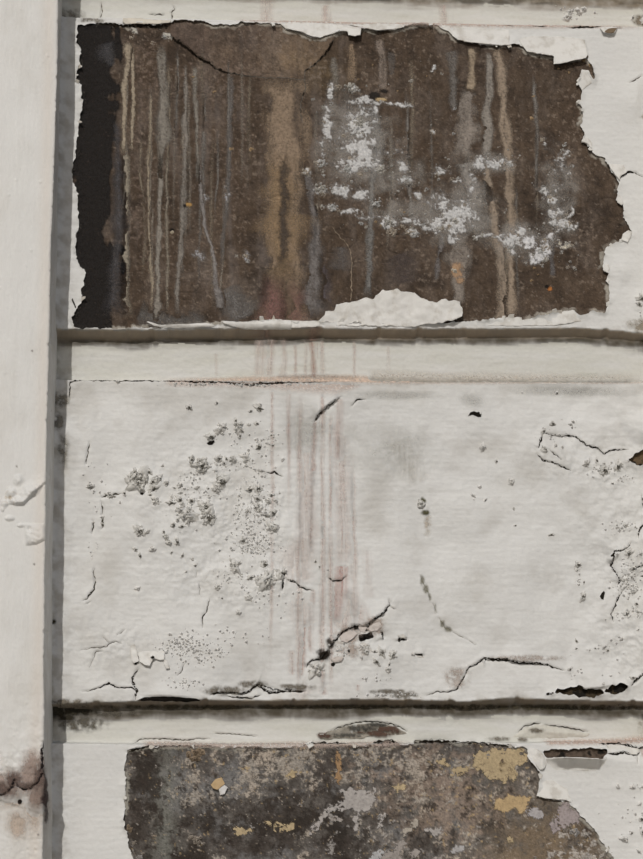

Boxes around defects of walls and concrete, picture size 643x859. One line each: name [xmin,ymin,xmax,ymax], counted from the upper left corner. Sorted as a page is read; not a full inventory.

crack [98,4,333,122]
leakage [68,11,252,329]
peeling [101,18,632,330]
leakage [263,41,579,321]
crack [538,433,626,471]
crack [610,498,643,622]
crack [89,671,138,700]
crack [212,684,304,699]
crack [306,603,394,668]
crack [421,578,565,694]
peeling [123,723,640,859]